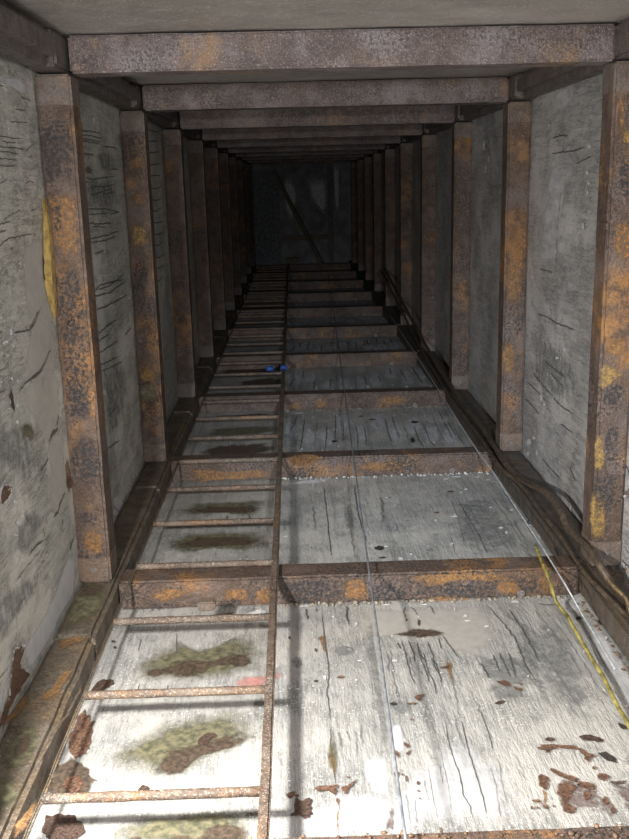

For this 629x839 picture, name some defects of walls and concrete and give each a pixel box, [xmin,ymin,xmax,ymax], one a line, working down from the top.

crack [0,85,34,184]
crack [0,209,36,250]
crack [0,291,47,345]
crack [0,350,51,393]
corrosion [591,423,618,535]
crack [17,493,74,609]
spalling [0,644,30,733]
corrosion [91,679,114,691]
corrosion [279,580,459,714]
corrosion [39,687,95,793]
corrosion [328,742,337,771]
corrosion [15,805,34,835]